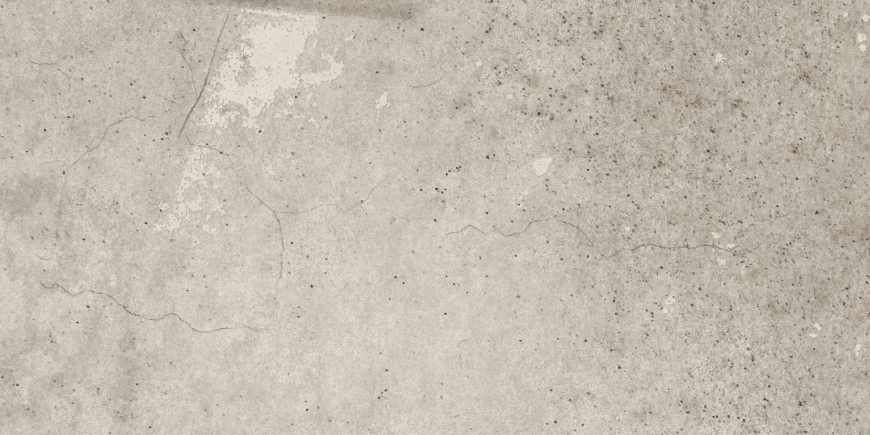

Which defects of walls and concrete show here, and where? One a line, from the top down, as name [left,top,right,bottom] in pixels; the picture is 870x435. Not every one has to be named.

peeling [196,9,354,139]
peeling [148,141,235,246]